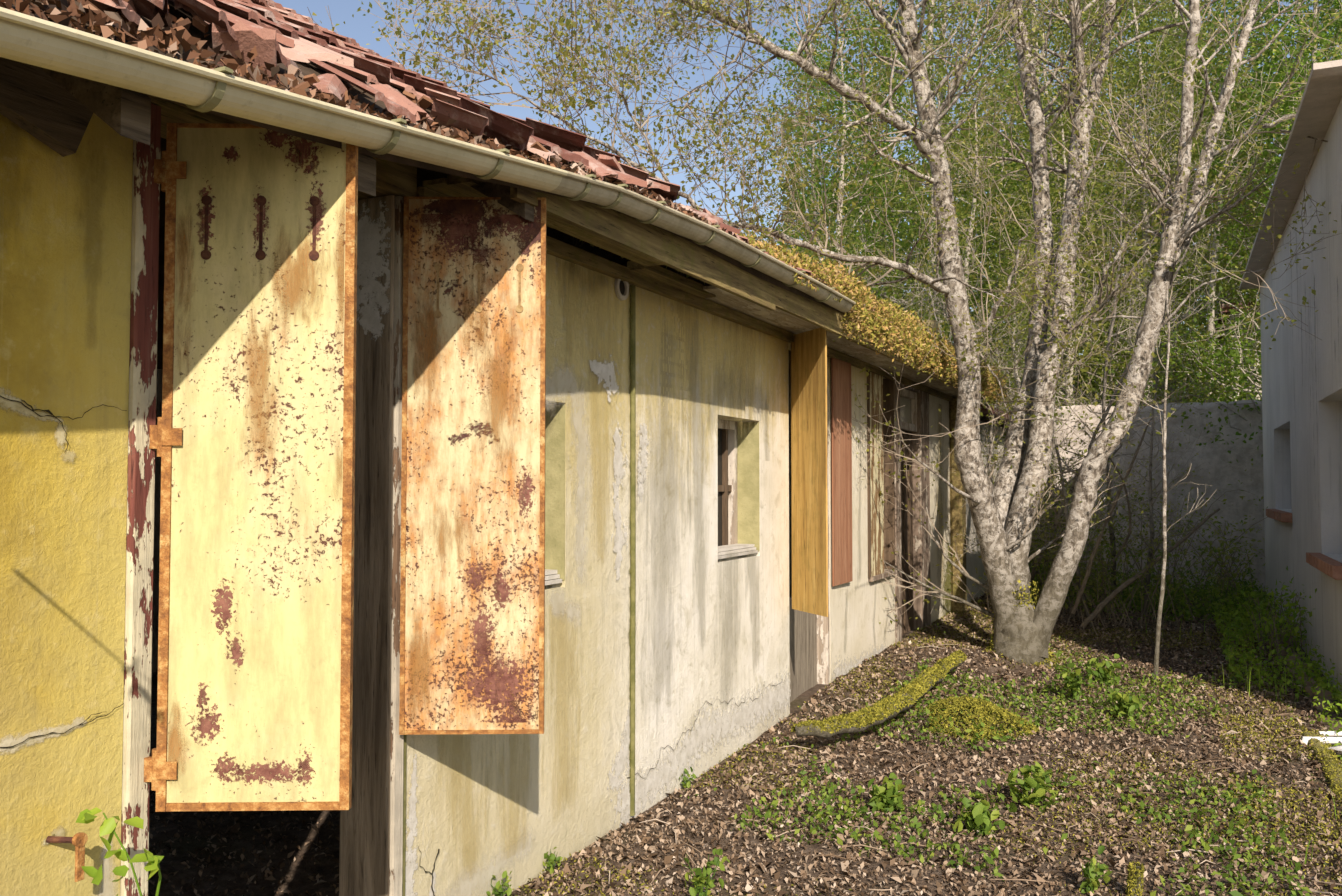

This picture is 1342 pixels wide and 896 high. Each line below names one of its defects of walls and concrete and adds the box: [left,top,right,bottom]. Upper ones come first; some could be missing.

rust [250,129,345,319]
rust [426,214,539,268]
crack [0,388,127,462]
rust [250,332,269,445]
rust [413,310,438,385]
rust [489,360,508,437]
peeling [590,354,619,402]
rust [516,463,535,523]
rust [211,578,246,674]
rust [438,523,537,723]
crack [0,703,124,753]
rust [168,677,316,788]